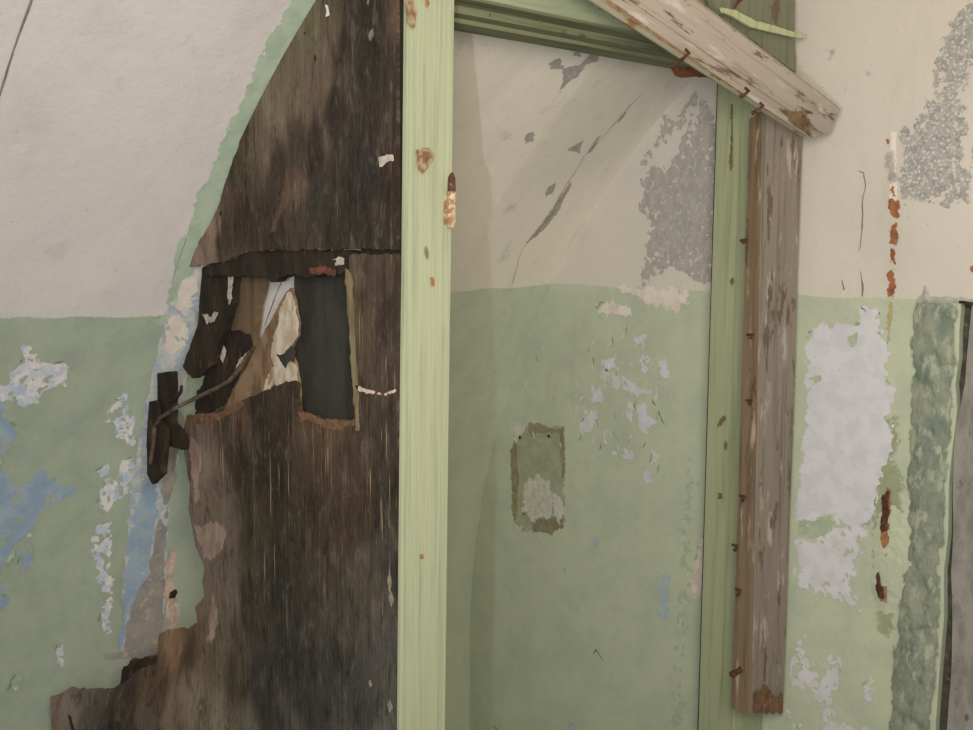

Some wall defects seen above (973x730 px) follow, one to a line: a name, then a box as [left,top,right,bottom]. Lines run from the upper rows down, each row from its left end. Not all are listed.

peeling [886,3,973,209]
peeling [566,91,716,484]
corrosion [886,132,901,340]
peeling [0,344,76,575]
flaking render [91,274,218,660]
peeling [792,305,898,616]
corrosion [873,417,902,556]
peeling [789,634,870,730]
corrosion [875,572,892,635]